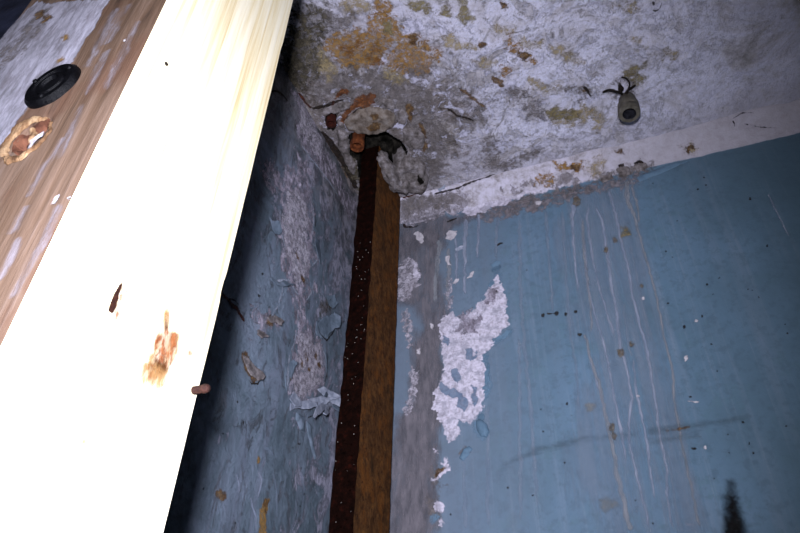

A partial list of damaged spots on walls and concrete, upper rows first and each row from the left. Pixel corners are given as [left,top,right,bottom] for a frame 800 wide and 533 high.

peeling [0,0,117,156]
peeling [0,239,19,279]
spalling [250,89,654,443]
leakage [281,0,675,533]
corrosion [141,311,180,387]